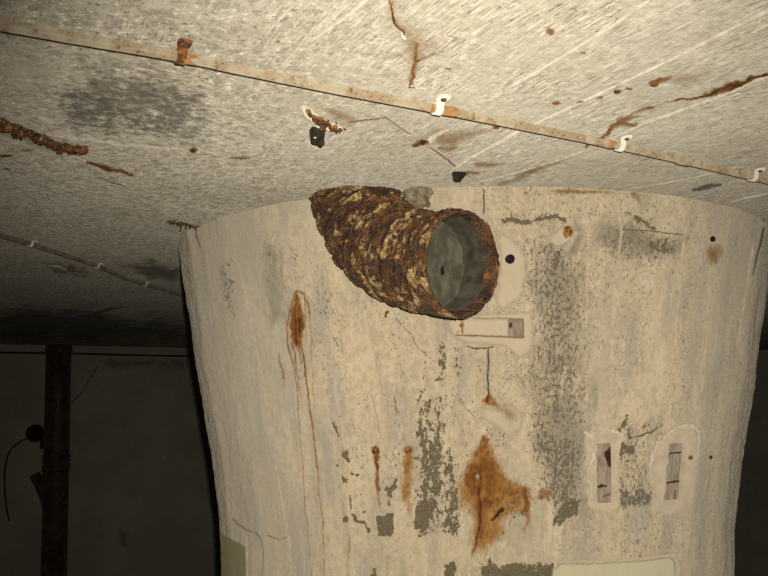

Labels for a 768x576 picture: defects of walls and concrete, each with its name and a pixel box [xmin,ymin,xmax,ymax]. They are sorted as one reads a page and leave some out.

crack [389,0,421,88]
corrosion [0,118,133,187]
leakage [46,67,206,152]
corrosion [600,106,654,149]
corrosion [167,220,200,231]
corrosion [286,290,317,468]
corrosion [372,446,380,505]
corrosion [402,447,413,506]
peeling [412,389,462,537]
corrosion [460,435,550,553]